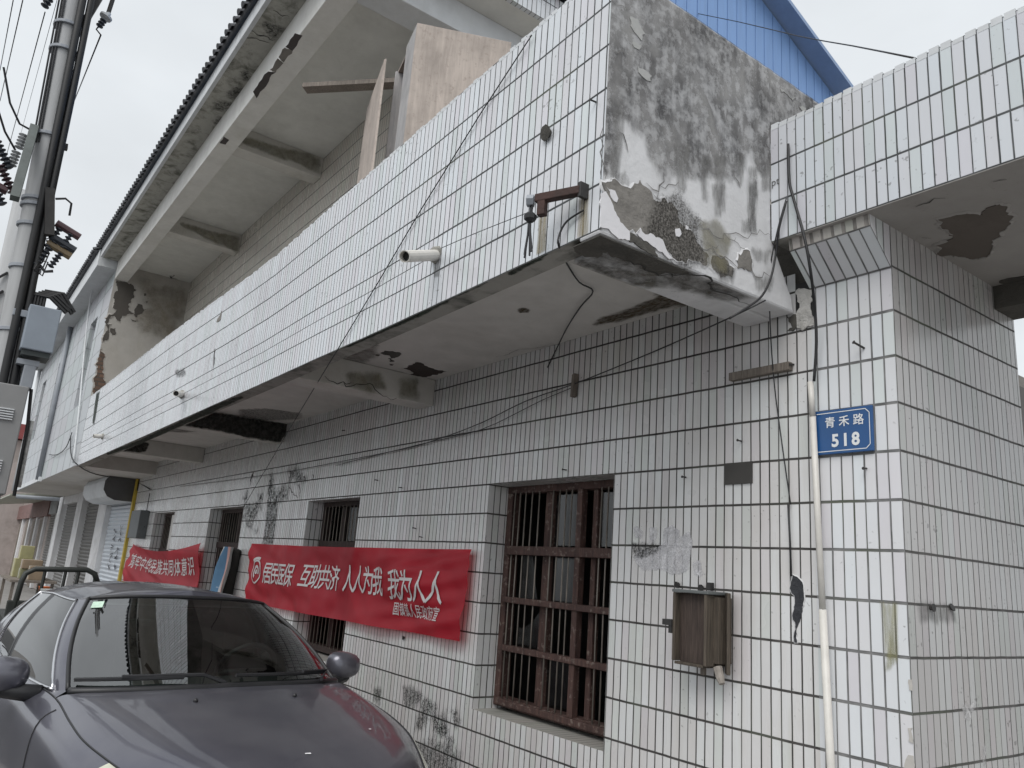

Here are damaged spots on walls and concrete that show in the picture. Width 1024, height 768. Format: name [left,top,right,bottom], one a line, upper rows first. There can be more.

flaking render [253,33,302,98]
damp [604,0,816,178]
crack [651,172,679,198]
flaking render [573,176,754,278]
crack [624,219,771,305]
peeling [931,202,1018,261]
peeling [92,280,148,395]
peeling [375,351,448,378]
spalling [787,314,797,331]
damp [263,470,305,544]
spalling [789,574,806,644]
damp [404,687,460,768]